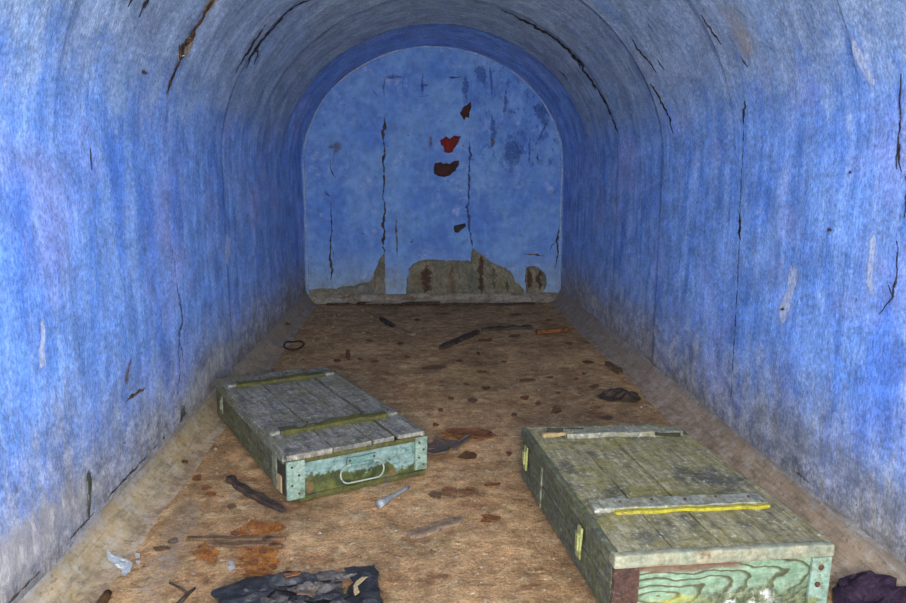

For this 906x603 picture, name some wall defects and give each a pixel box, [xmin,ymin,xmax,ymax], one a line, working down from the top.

crack [166,0,214,94]
crack [381,117,398,257]
peeling [434,135,461,177]
peeling [460,102,471,120]
crack [465,142,474,246]
spalling [406,248,547,294]
crack [732,101,746,368]
crack [880,241,898,313]
crack [896,76,906,218]